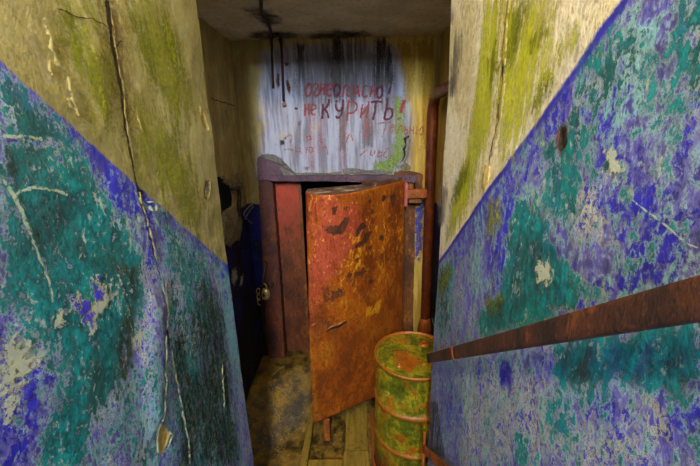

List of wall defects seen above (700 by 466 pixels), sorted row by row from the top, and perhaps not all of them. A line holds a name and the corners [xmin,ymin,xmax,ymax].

leakage [293,37,433,147]
crack [488,0,511,166]
crack [59,0,170,345]
peeling [601,148,627,176]
peeling [51,274,119,336]
peeling [535,260,554,287]
peeling [0,329,41,428]